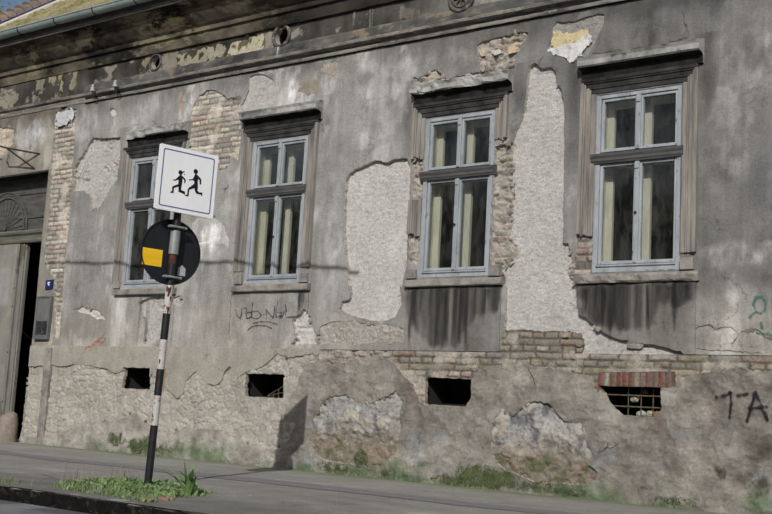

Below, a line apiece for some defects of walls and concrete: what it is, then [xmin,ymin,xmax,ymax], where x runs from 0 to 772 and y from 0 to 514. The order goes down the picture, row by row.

peeling [166,27,283,67]
flaking render [414,30,528,84]
flaking render [547,14,604,64]
flaking render [0,128,14,164]
flaking render [23,62,772,452]
leakage [409,287,418,330]
leakage [429,286,468,345]
leakage [481,285,500,312]
leakage [584,283,649,330]
leakage [664,281,689,319]
crack [697,324,772,354]
flaking render [308,391,403,470]